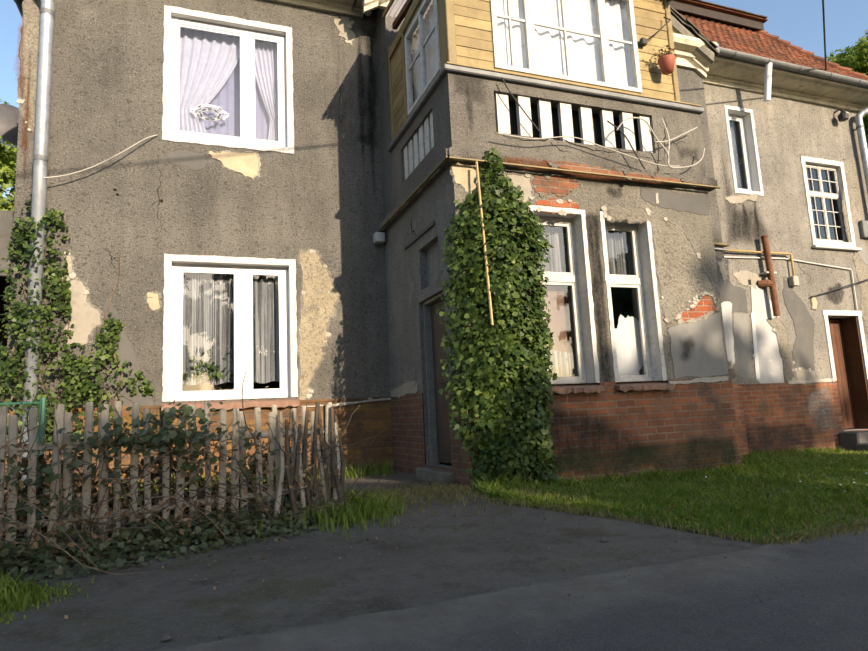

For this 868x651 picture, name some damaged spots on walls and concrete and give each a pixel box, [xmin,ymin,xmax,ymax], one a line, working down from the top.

peeling [334,17,356,45]
flaking render [208,150,261,181]
flaking render [450,162,489,194]
flaking render [502,160,686,216]
flaking render [600,193,768,325]
water stain [729,204,765,247]
flaking render [840,157,868,333]
flaking render [144,290,162,312]
flaking render [297,246,341,400]
peeling [751,313,760,379]
flaking render [766,316,817,385]
flaking render [386,380,419,402]